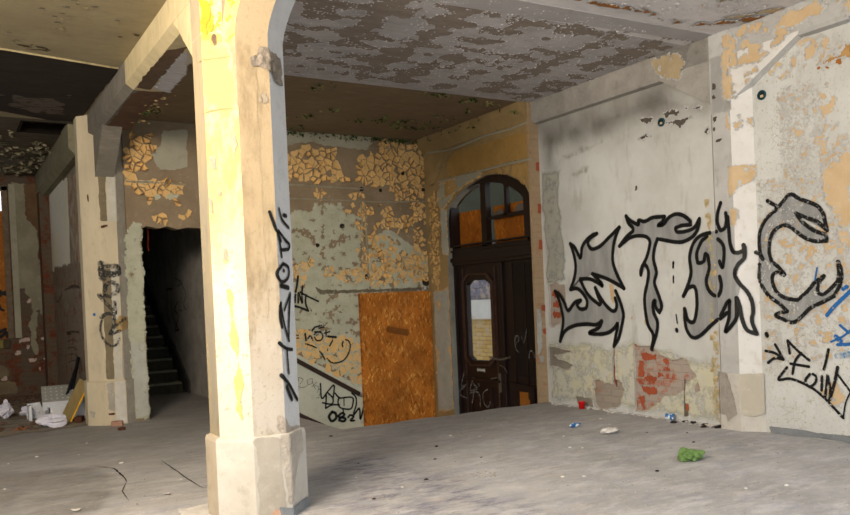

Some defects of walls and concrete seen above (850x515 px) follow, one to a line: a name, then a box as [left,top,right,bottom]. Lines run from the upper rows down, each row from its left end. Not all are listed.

peeling [87,52,192,228]
flaking render [0,130,53,355]
peeling [102,222,151,423]
peeling [226,0,703,515]
peeling [709,303,765,423]
peeling [818,382,846,408]